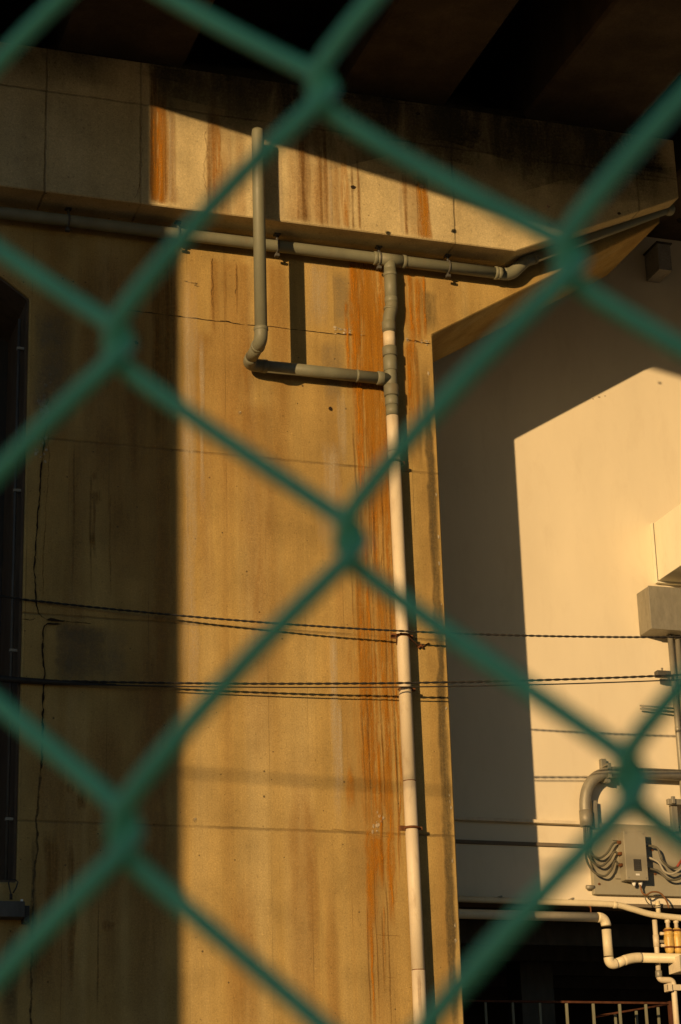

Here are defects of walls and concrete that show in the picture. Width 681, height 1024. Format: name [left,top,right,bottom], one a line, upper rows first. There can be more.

corrosion [345,265,387,483]
crack [24,439,91,927]
corrosion [358,583,401,1001]